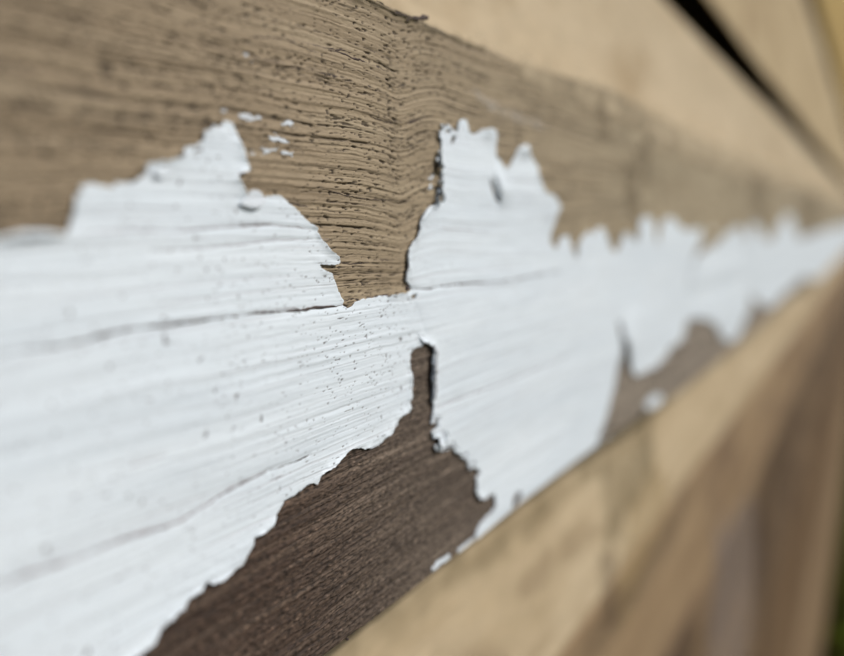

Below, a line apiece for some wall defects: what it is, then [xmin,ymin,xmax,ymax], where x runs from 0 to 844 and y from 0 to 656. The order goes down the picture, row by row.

peeling [0,121,426,656]
crack [0,271,561,356]
peeling [405,119,844,540]